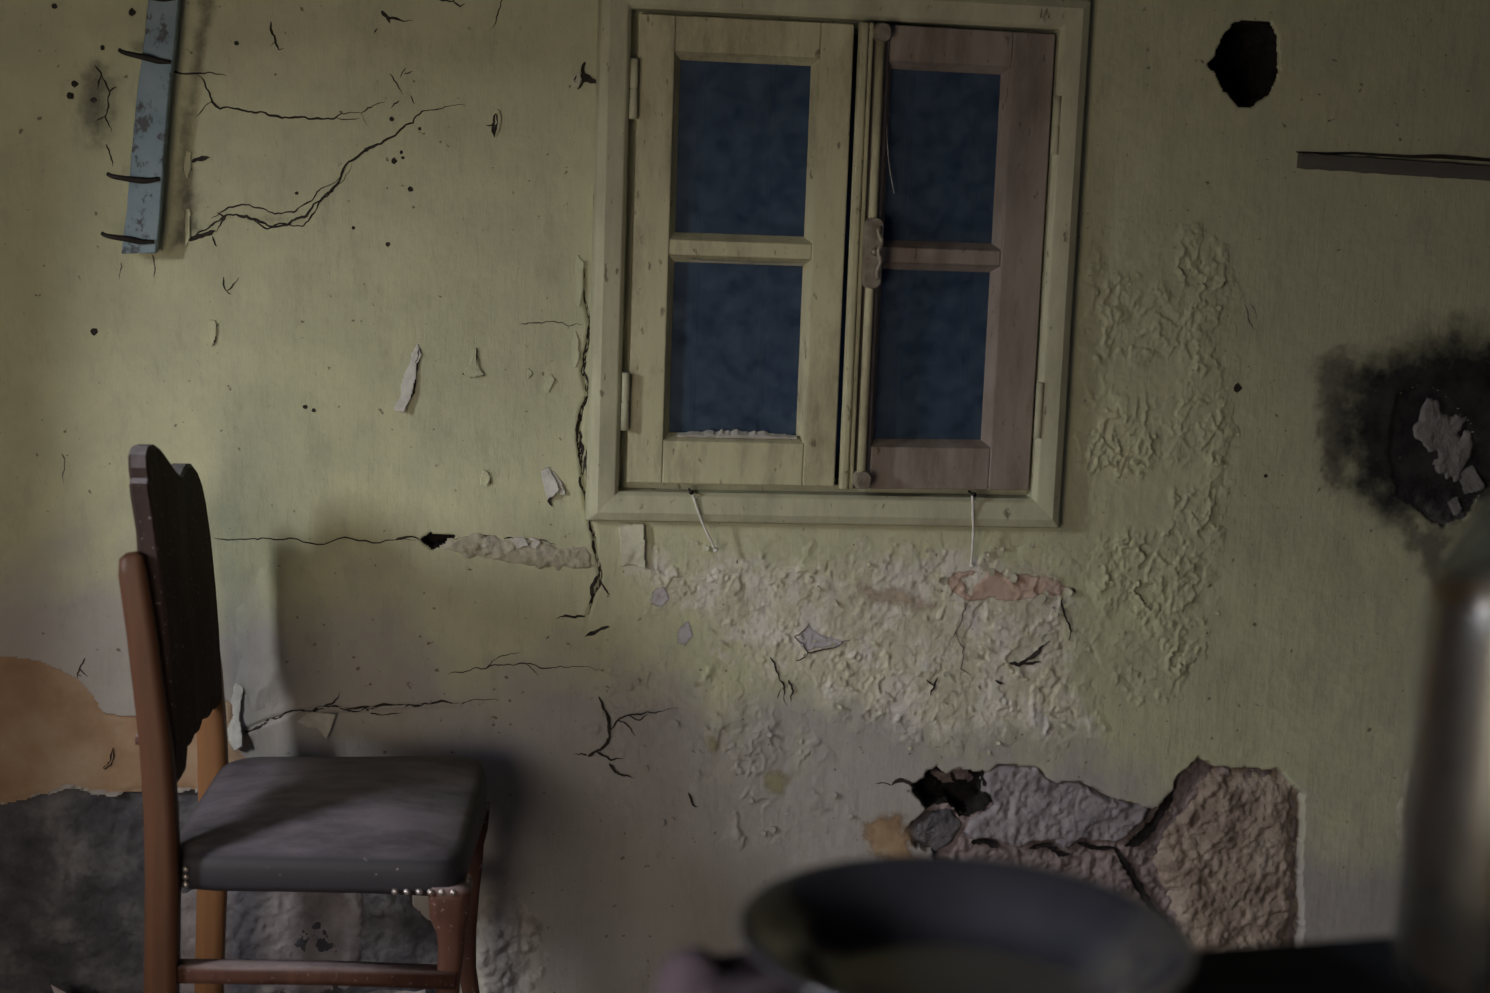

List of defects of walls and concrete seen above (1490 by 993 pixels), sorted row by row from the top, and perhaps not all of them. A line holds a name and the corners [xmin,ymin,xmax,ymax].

crack [174,68,466,294]
crack [215,272,678,778]
peeling [440,217,1298,949]
leakage [1338,332,1490,522]
flaking render [1413,398,1485,527]
flaking render [0,656,145,993]
flaking render [177,733,198,831]
flaking render [225,684,246,763]
flaking render [180,984,195,993]
flaking render [180,887,197,959]
flaking render [224,984,436,993]
flaking render [225,891,438,964]